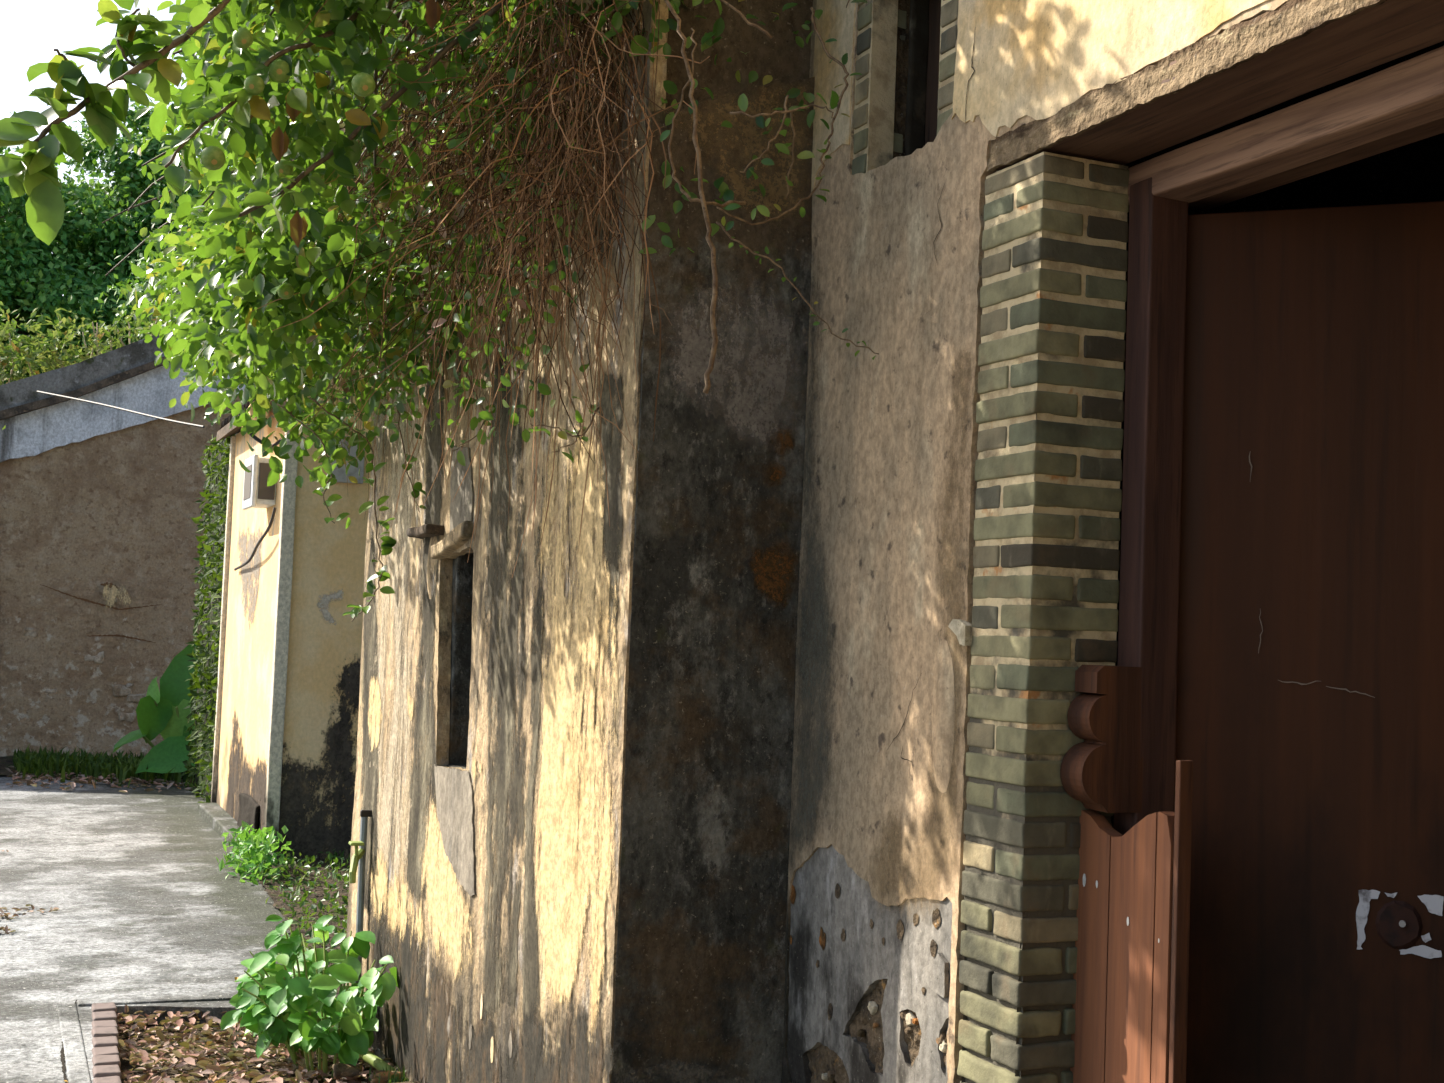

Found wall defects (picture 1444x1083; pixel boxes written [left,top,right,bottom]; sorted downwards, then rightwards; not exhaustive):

leakage [226,340,762,1083]
leakage [672,284,838,862]
peeling [787,845,952,1083]
leakage [877,356,971,907]